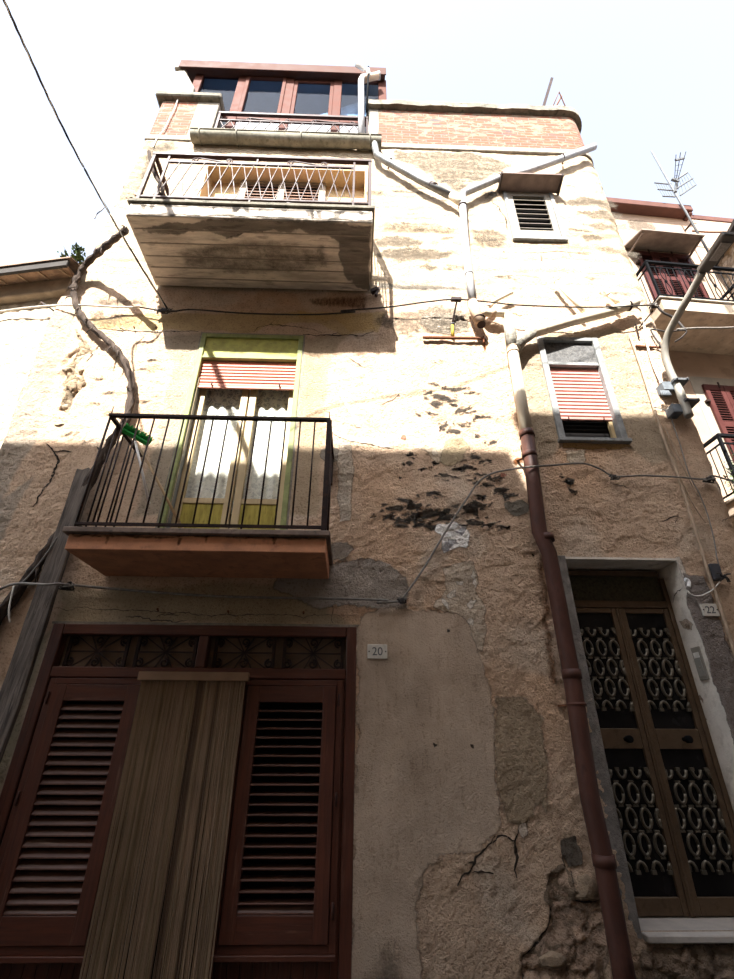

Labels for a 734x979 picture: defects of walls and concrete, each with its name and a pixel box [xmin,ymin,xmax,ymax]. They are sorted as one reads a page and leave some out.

leakage [394,150,508,198]
leakage [129,203,464,291]
leakage [472,229,504,247]
leakage [566,197,655,258]
flaking render [54,332,103,436]
crack [33,443,71,507]
peeling [401,435,445,463]
crack [457,827,519,886]
flaking render [544,864,599,909]
flaking render [523,941,576,971]